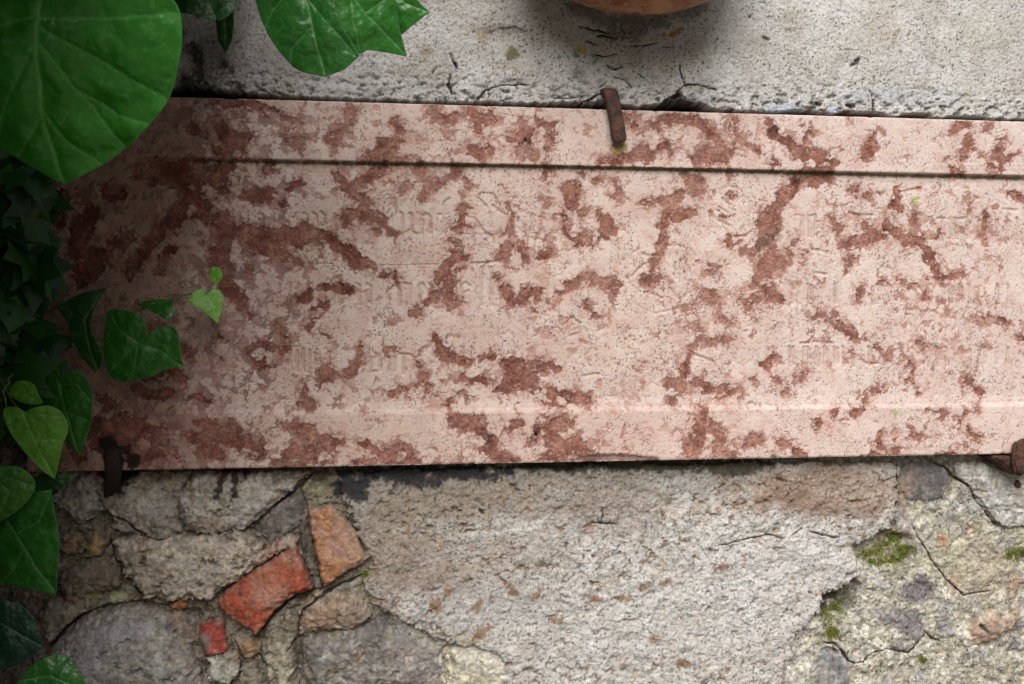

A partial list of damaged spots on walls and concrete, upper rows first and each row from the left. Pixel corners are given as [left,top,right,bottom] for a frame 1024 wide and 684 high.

crack [432,55,530,105]
crack [553,25,717,109]
crack [931,461,995,525]
crack [911,524,986,596]
spalling [820,586,843,609]